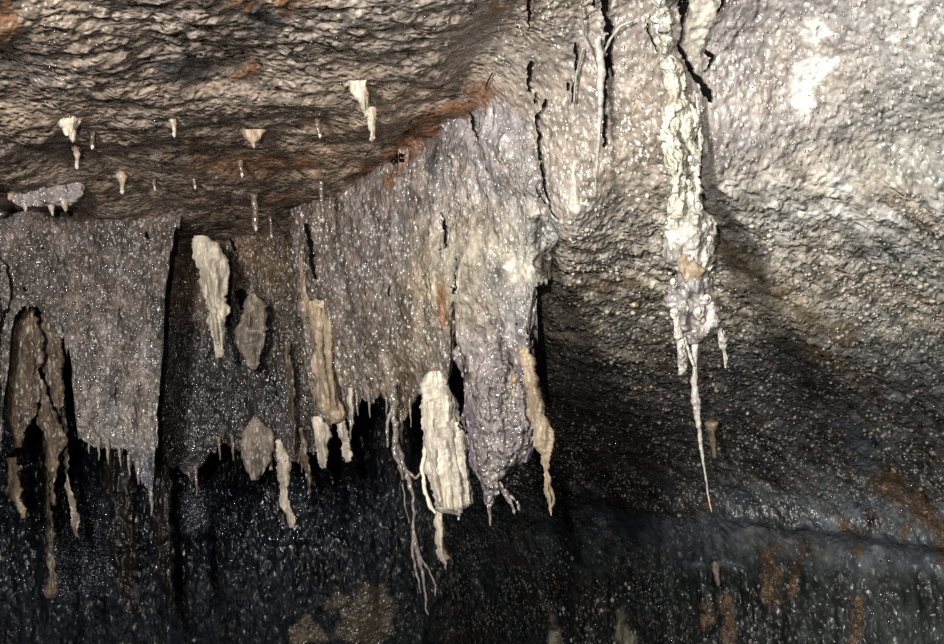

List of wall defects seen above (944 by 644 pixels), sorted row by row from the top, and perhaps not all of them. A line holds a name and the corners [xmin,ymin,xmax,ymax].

crack [525,0,533,31]
crack [591,0,614,147]
crack [646,0,714,103]
efflorescence [669,0,718,63]
rust [337,79,495,199]
crack [526,42,578,218]
efflorescence [425,216,484,327]
damp [501,248,548,284]
damp [53,483,111,600]
damp [169,463,218,536]